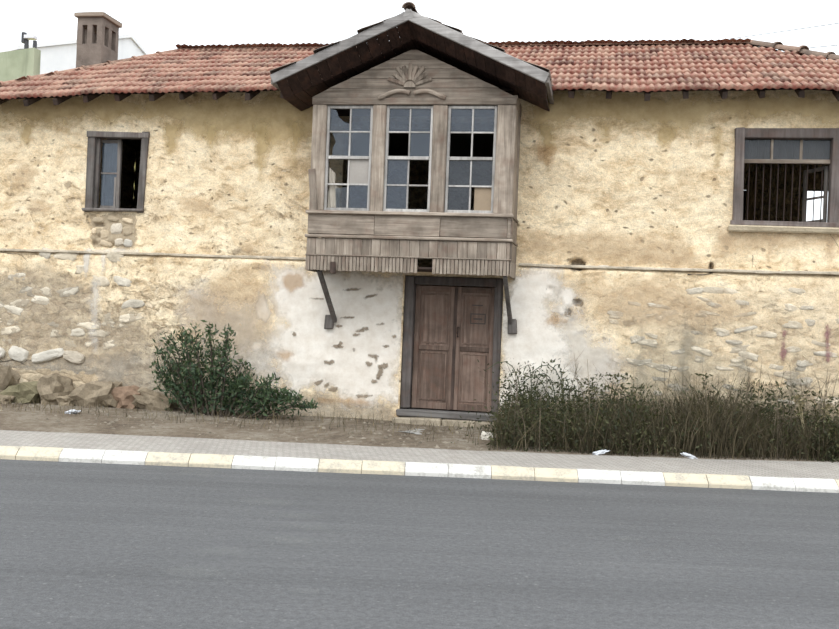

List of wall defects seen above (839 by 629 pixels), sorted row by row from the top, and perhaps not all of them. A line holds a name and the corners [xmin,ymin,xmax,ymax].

flaking render [90,212,137,263]
flaking render [39,247,132,287]
flaking render [0,273,145,364]
peeling [188,292,276,380]
peeling [366,354,388,383]
peeling [553,288,713,399]
flaking render [685,287,757,317]
flaking render [713,303,815,373]
flaking render [769,340,838,387]